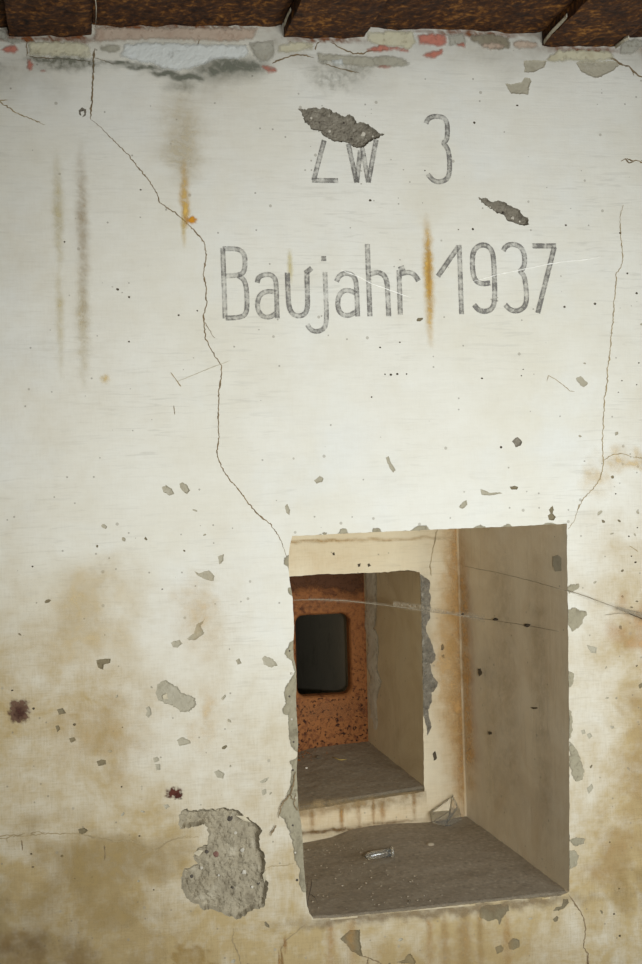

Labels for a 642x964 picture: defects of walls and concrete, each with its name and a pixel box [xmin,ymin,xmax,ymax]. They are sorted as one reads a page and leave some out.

flaking render [419,34,446,58]
peeling [506,60,546,106]
peeling [576,60,619,78]
spalling [298,107,384,148]
corrosion [172,129,197,223]
spalling [478,197,529,226]
crack [26,42,287,557]
crack [568,207,642,529]
peeling [146,680,197,718]
spalling [178,807,269,920]
crack [568,894,589,963]